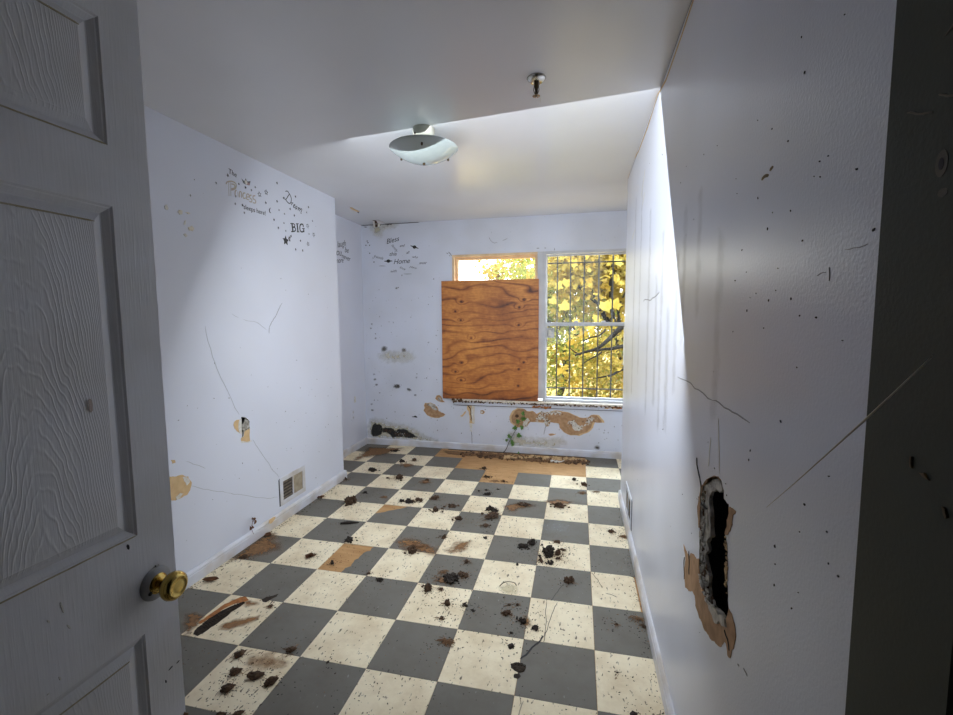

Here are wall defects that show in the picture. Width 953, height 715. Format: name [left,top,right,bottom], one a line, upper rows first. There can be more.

spalling [233,417,252,443]
damp [355,379,419,460]
peeling [412,395,445,418]
peeling [509,408,604,436]
peeling [170,475,192,501]
spalling [683,476,736,658]